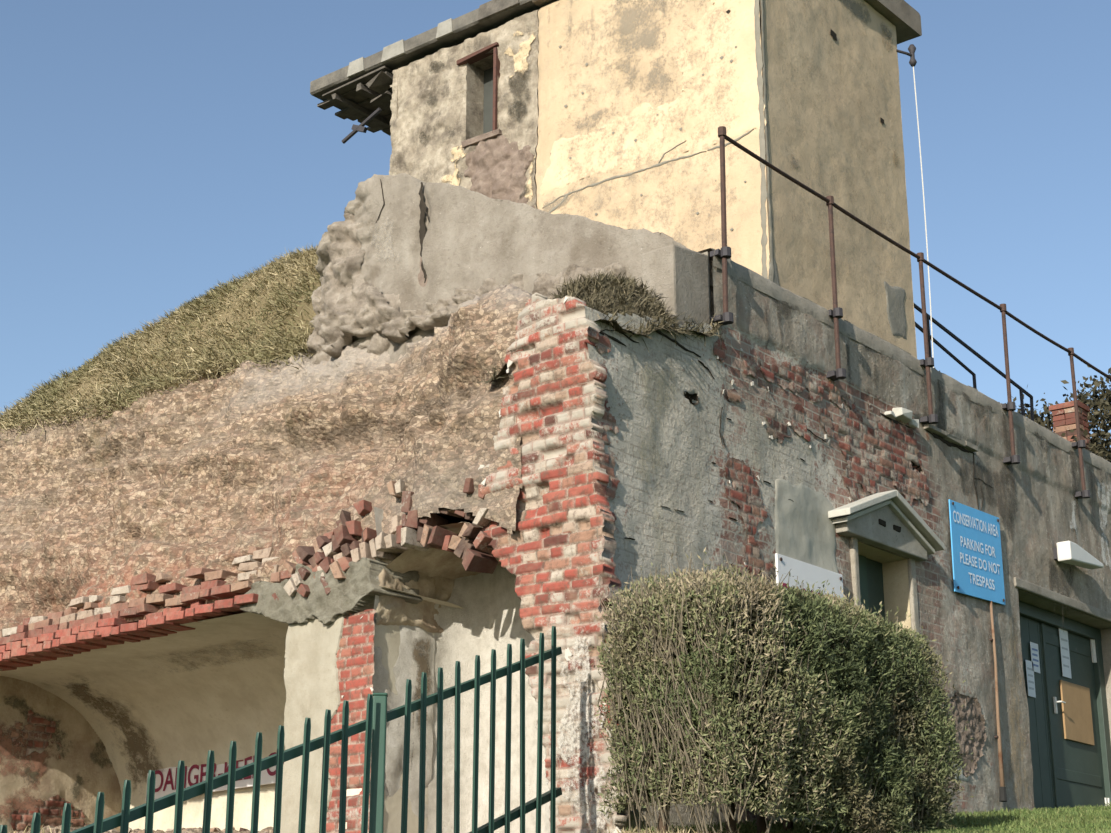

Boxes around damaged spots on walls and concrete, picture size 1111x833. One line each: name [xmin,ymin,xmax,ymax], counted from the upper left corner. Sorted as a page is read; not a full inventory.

water stain [613,0,658,50]
flaking render [389,10,539,209]
crack [542,0,774,283]
crack [419,182,430,283]
spalling [307,213,626,366]
crack [599,325,715,379]
crack [718,407,726,448]
spalling [713,323,929,507]
spalling [360,553,455,633]
spalling [724,457,774,595]
peeling [557,636,622,833]
spalling [942,690,987,777]